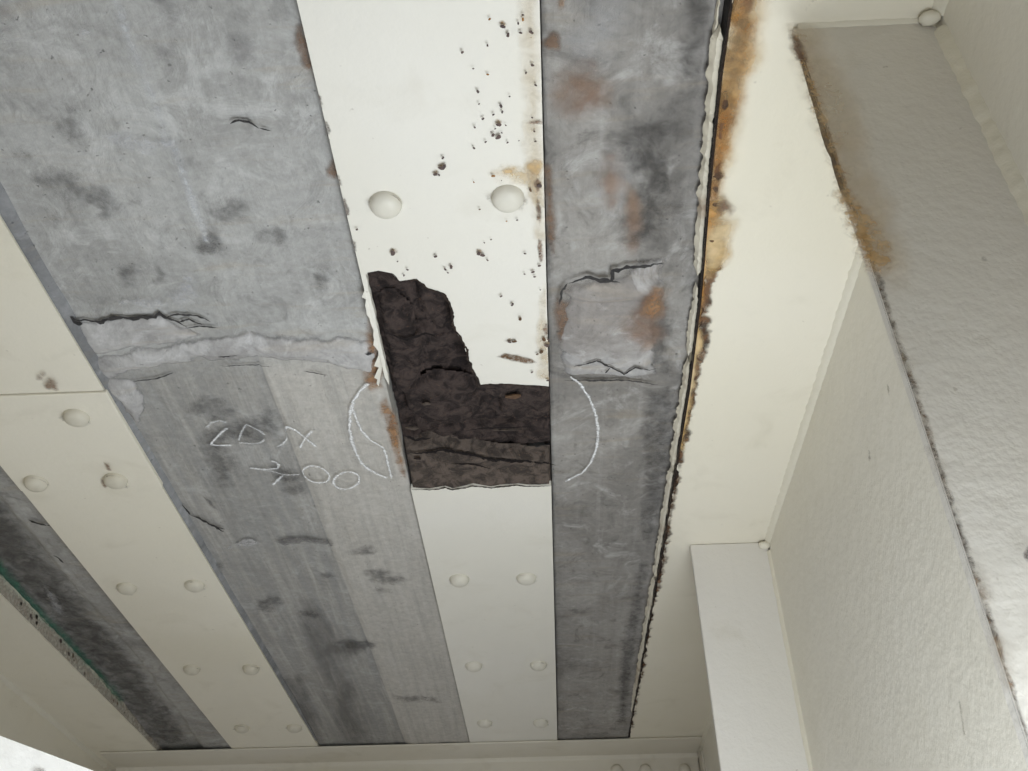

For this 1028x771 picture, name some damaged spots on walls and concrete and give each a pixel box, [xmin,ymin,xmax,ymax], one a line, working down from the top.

crack [70,311,216,328]
crack [230,119,270,131]
spalling [367,271,550,445]
corrosion [491,161,555,241]
corrosion [501,301,568,373]
corrosion [544,33,560,49]
crack [559,263,663,304]
damp [622,125,667,237]
corrosion [681,330,702,448]
corrosion [701,184,730,303]
corrosion [716,0,756,162]
corrosion [792,36,890,272]